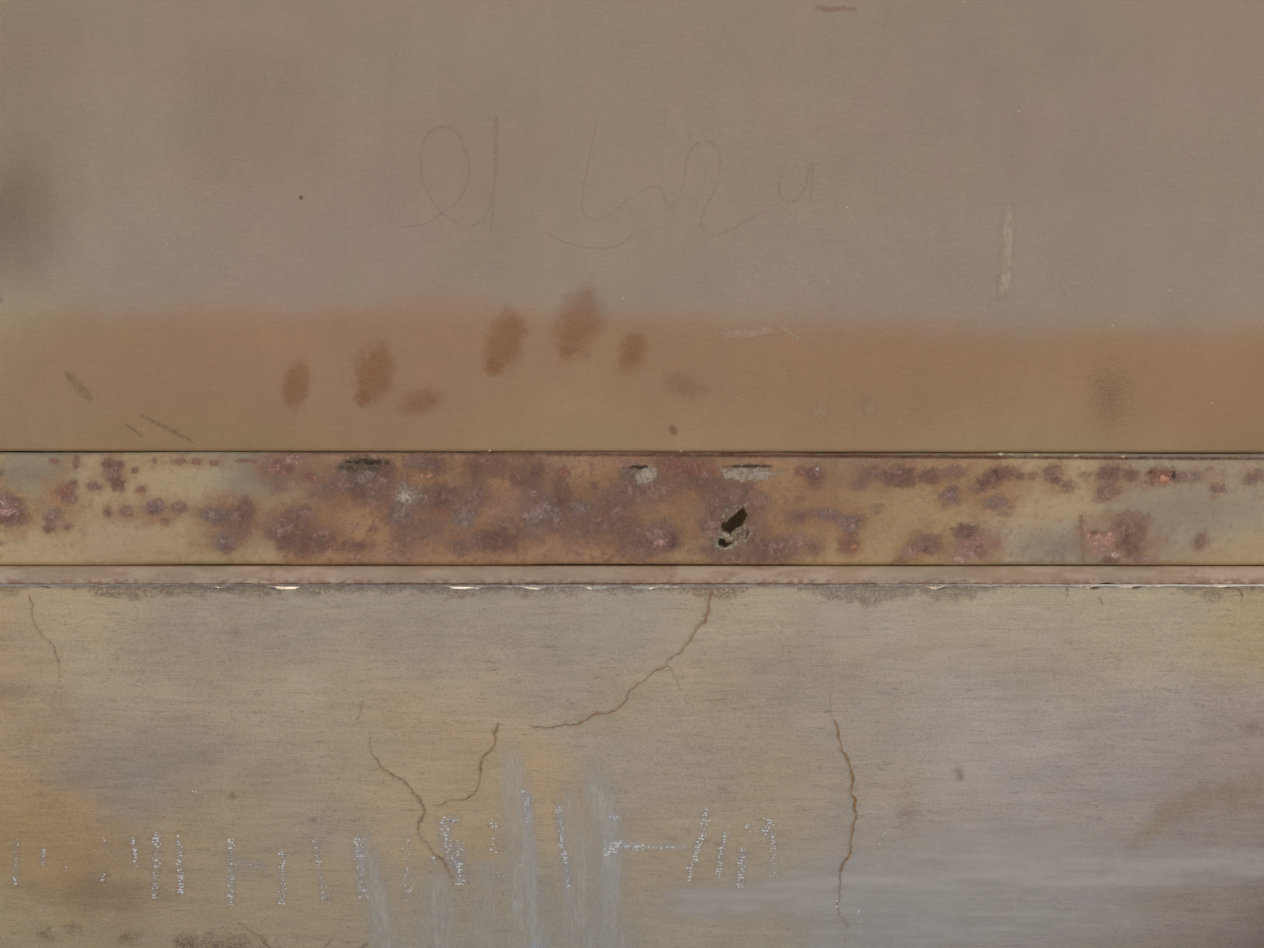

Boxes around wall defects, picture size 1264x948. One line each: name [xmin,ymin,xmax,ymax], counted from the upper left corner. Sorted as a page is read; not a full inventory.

rust [0,491,28,528]
rust [40,456,186,533]
rust [692,486,770,561]
rust [641,454,1264,517]
crack [533,591,714,728]
crack [369,724,499,823]
water stain [559,778,628,948]
crack [835,721,857,938]